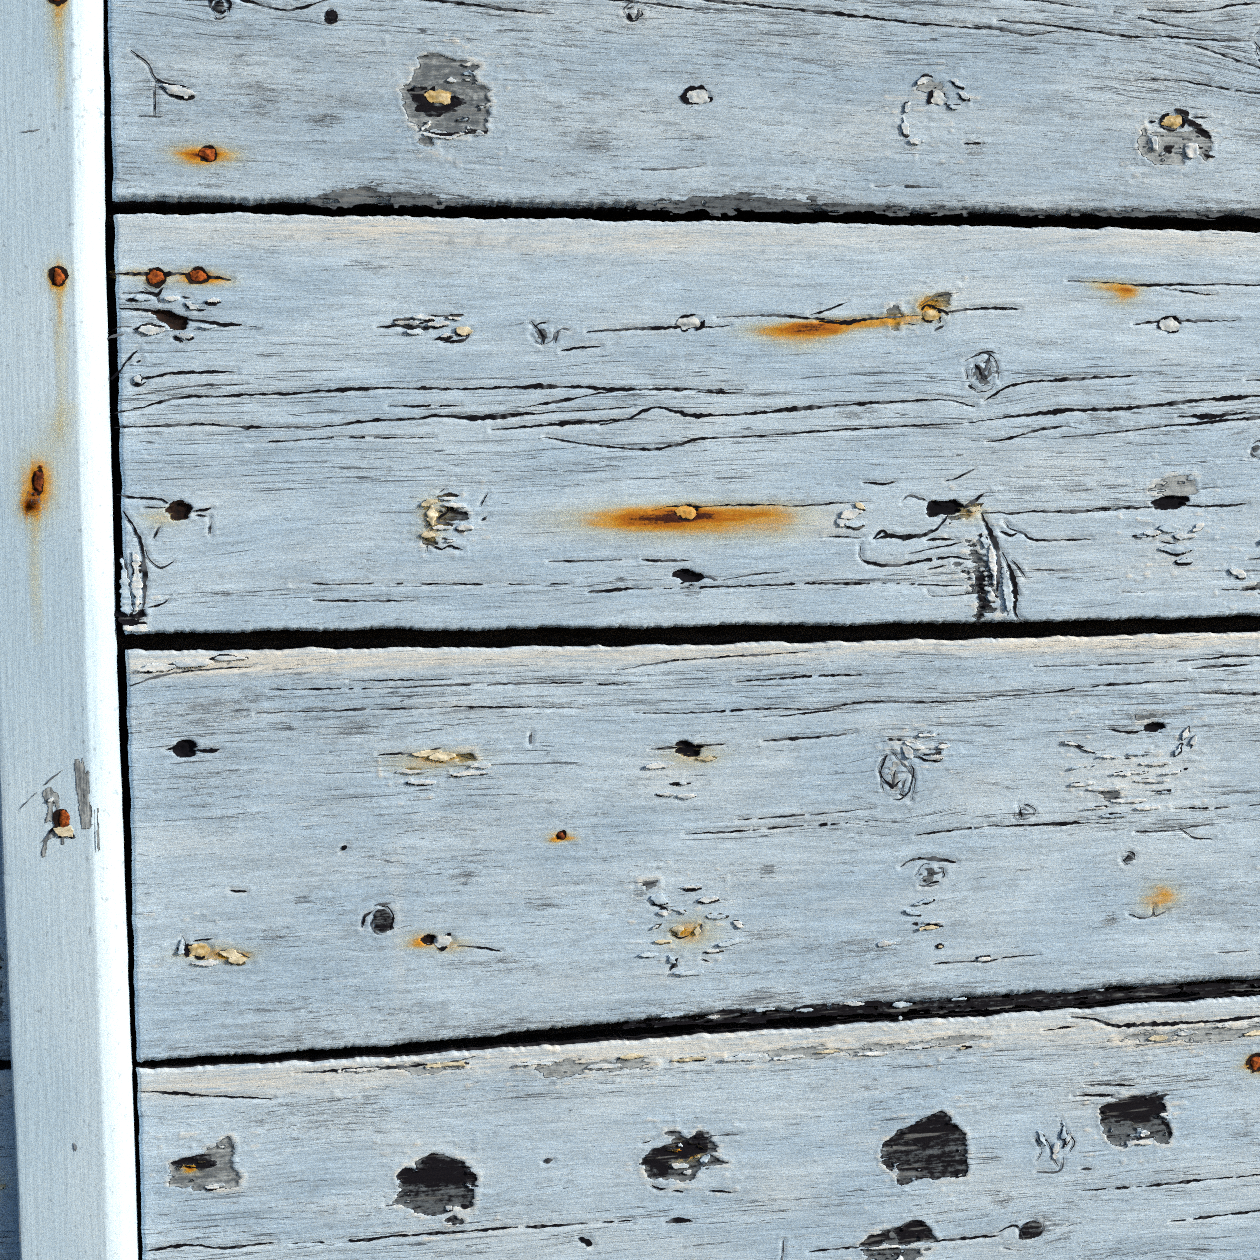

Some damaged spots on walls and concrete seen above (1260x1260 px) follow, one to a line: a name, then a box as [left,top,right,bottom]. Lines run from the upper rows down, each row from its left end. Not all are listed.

peeling [400,52,491,147]
peeling [1138,108,1215,165]
rust [180,272,225,284]
rust [758,300,939,340]
rust [20,461,52,519]
rust [587,504,791,534]
peeling [1083,1083,1173,1147]
peeling [168,1136,242,1191]
peeling [386,1153,478,1225]
peeling [640,1131,739,1192]
peeling [880,1111,969,1186]
peeling [859,1220,938,1260]